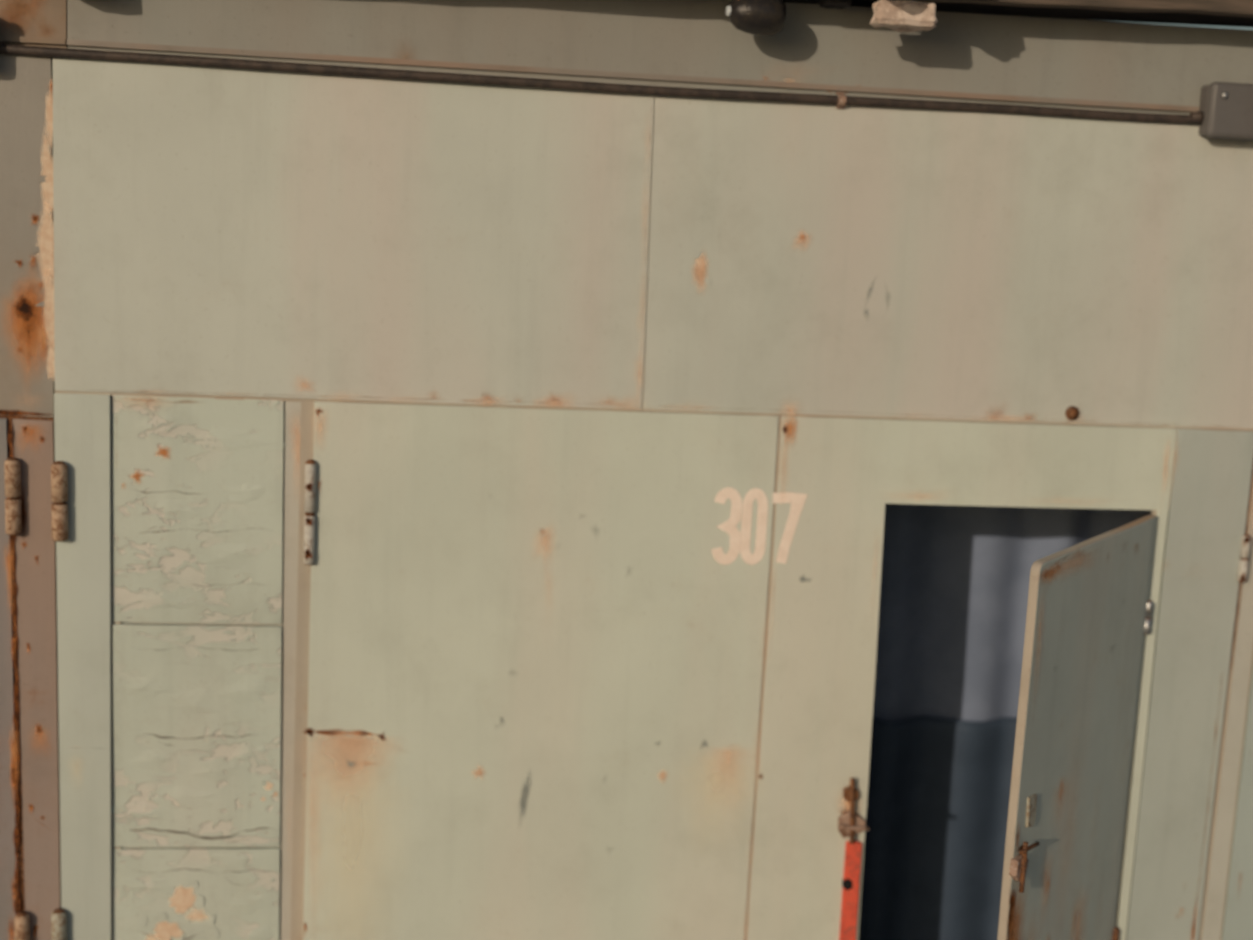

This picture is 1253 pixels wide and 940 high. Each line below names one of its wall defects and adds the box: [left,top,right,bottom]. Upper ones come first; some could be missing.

peeling [31,83,55,377]
rust [12,283,45,357]
rust [7,496,44,940]
rust [305,728,384,768]
rust [1008,893,1019,940]